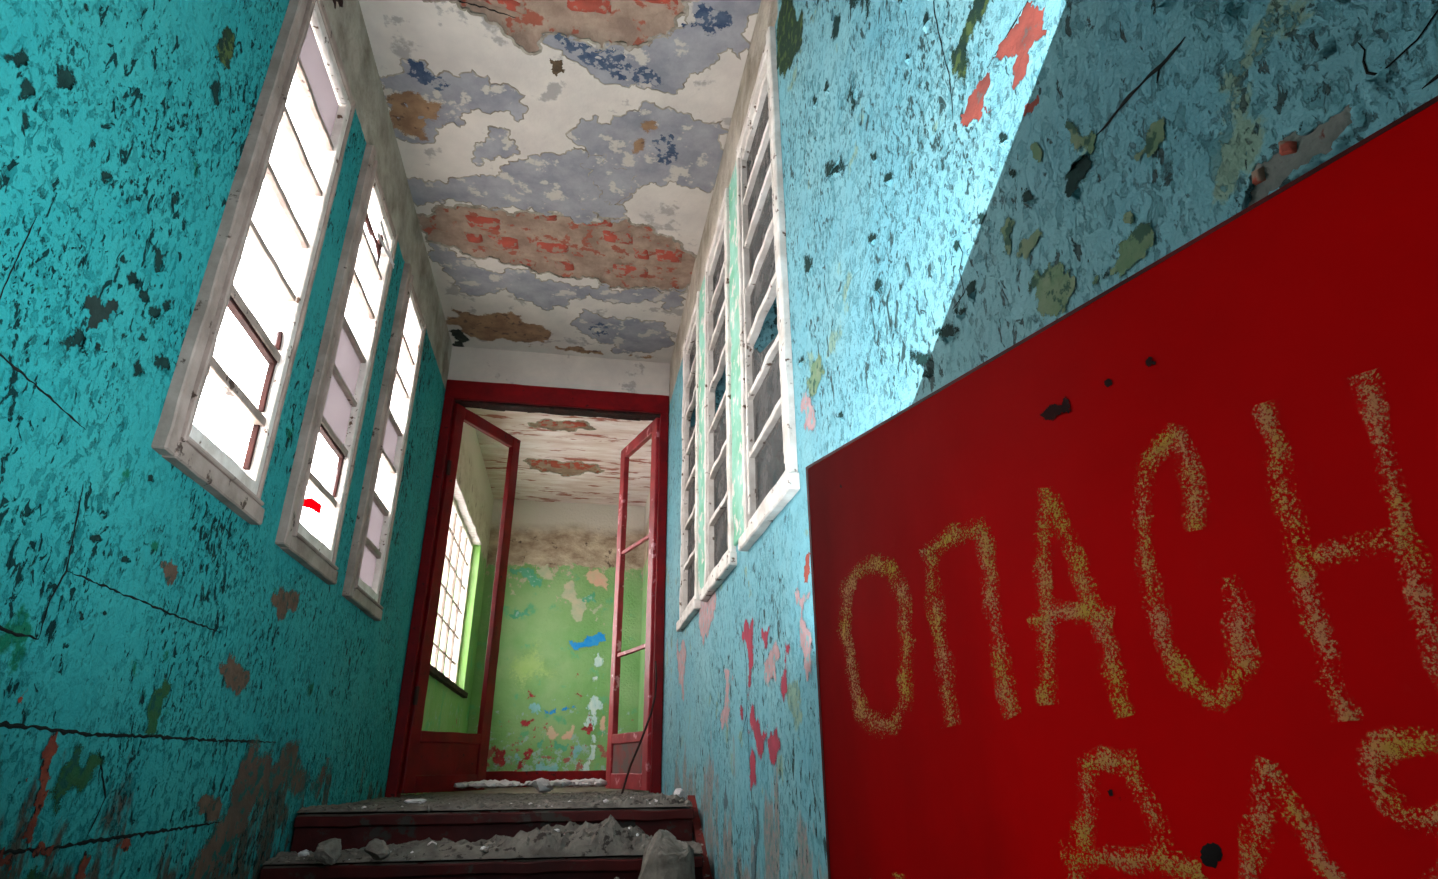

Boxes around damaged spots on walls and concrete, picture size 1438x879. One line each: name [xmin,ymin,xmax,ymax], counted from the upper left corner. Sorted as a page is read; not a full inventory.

peeling [776,0,871,79]
peeling [950,0,1051,130]
crack [1357,9,1438,76]
crack [1422,74,1438,89]
spalling [379,0,761,354]
spalling [1064,119,1096,205]
spalling [1241,94,1366,210]
crack [0,216,37,300]
crack [0,353,86,430]
spalling [523,458,605,477]
crack [0,488,221,640]
crack [0,721,276,855]